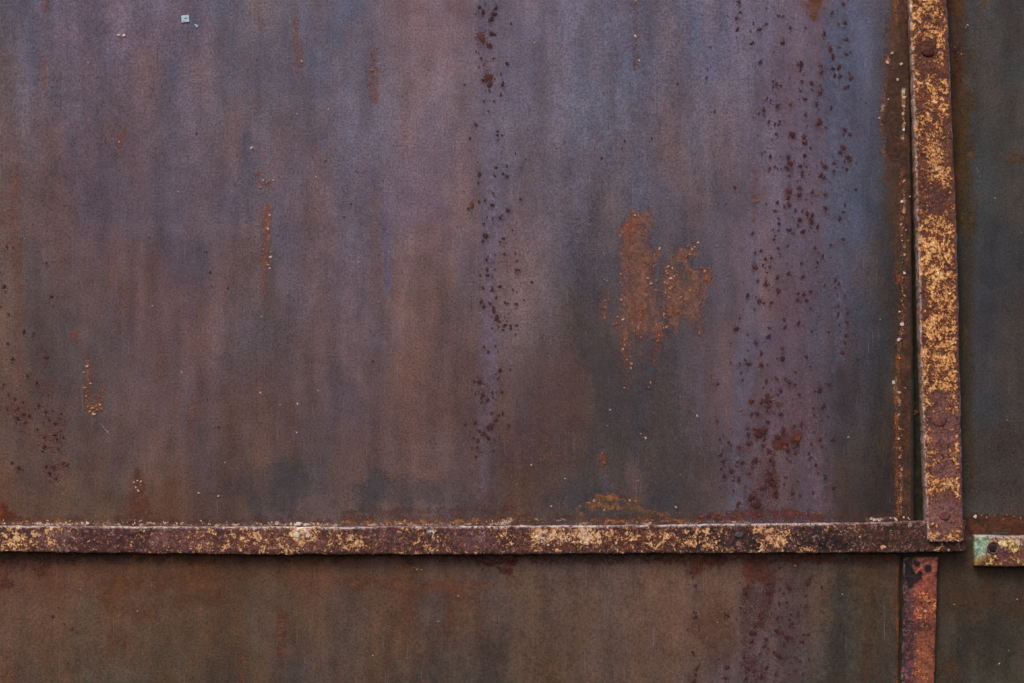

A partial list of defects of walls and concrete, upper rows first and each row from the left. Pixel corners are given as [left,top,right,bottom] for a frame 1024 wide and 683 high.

rust [0,139,910,683]
rust [926,0,986,497]